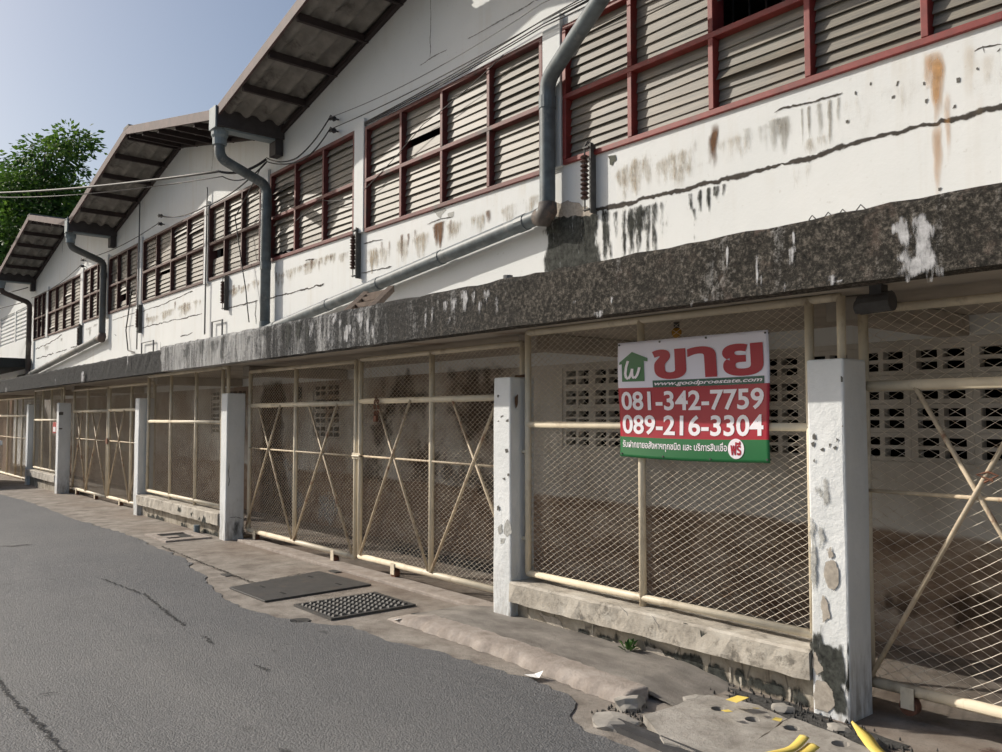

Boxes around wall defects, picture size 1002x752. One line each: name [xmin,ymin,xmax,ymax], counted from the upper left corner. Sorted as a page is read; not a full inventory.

corrosion [931,58,943,103]
corrosion [710,128,718,156]
crack [596,103,1002,211]
damp [544,202,662,272]
damp [281,312,374,351]
efflorescence [443,290,497,310]
peeling [815,479,829,505]
peeling [809,518,839,622]
crack [105,579,213,643]
mould [810,633,849,715]
crack [0,680,68,752]